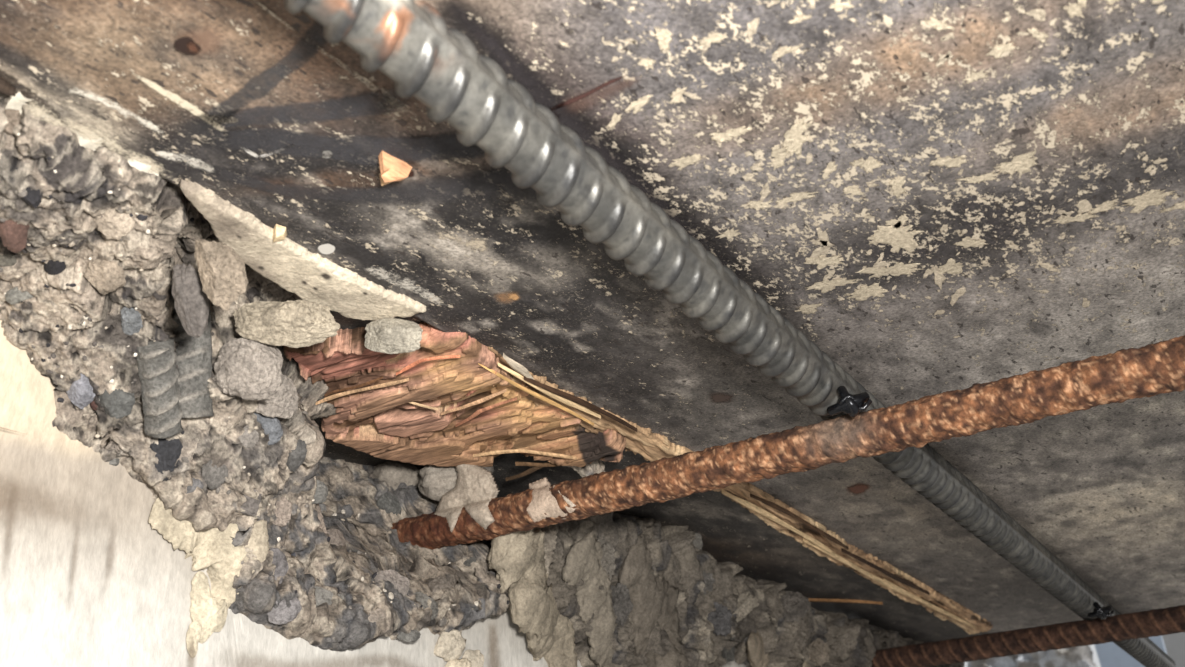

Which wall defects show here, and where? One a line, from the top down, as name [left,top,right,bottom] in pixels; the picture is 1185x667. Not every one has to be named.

water stain [156,151,515,203]
water stain [197,25,484,165]
water stain [438,232,486,251]
water stain [470,26,711,252]
peeling [605,95,653,131]
peeling [602,21,683,77]
peeling [686,18,759,65]
peeling [669,110,1185,316]
peeling [962,9,1049,104]
spalling [0,93,510,651]
spalling [534,512,925,667]
spalling [931,645,1096,667]